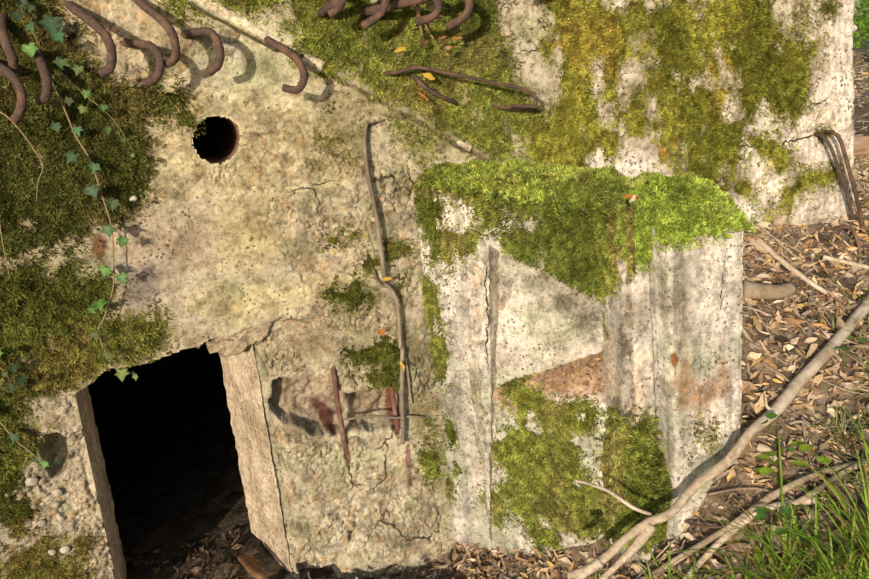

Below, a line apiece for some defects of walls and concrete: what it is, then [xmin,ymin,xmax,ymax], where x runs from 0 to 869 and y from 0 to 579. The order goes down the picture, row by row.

spalling [135,91,444,579]
crack [483,262,491,373]
rust [311,396,336,435]
rust [385,386,400,437]
crack [348,428,393,493]
crack [366,511,440,543]